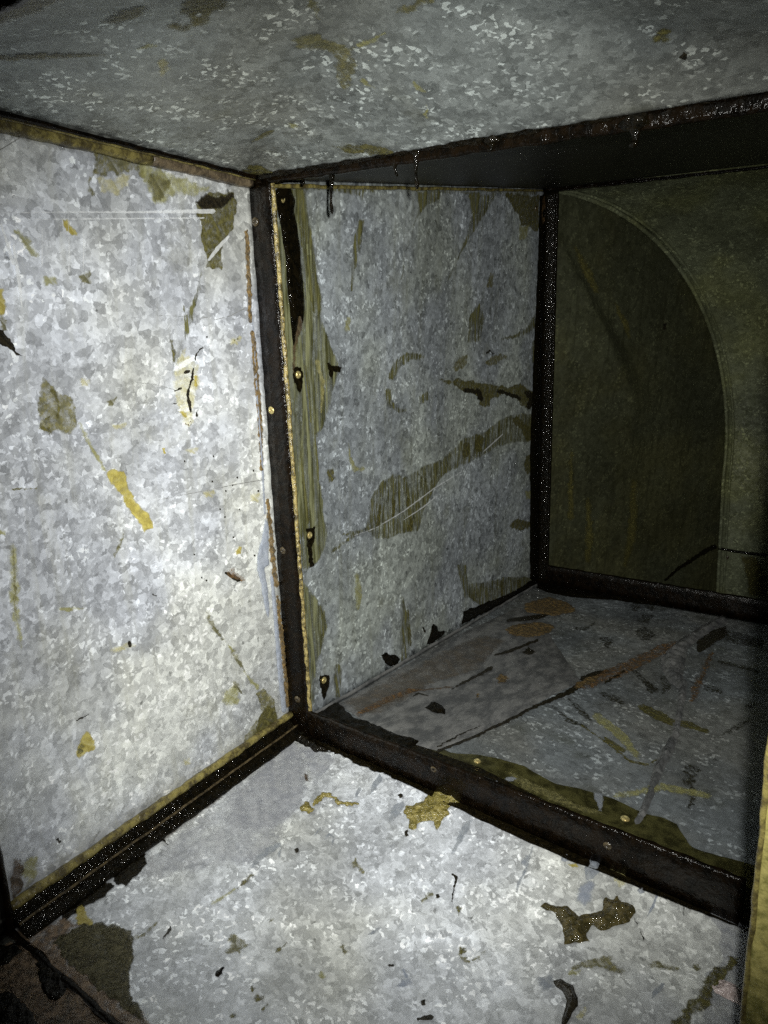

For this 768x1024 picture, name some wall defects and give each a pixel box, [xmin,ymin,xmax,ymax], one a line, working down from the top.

water stain [196,193,234,210]
corrosion [244,230,264,471]
water stain [497,390,532,441]
water stain [377,497,413,532]
corrosion [265,499,289,708]